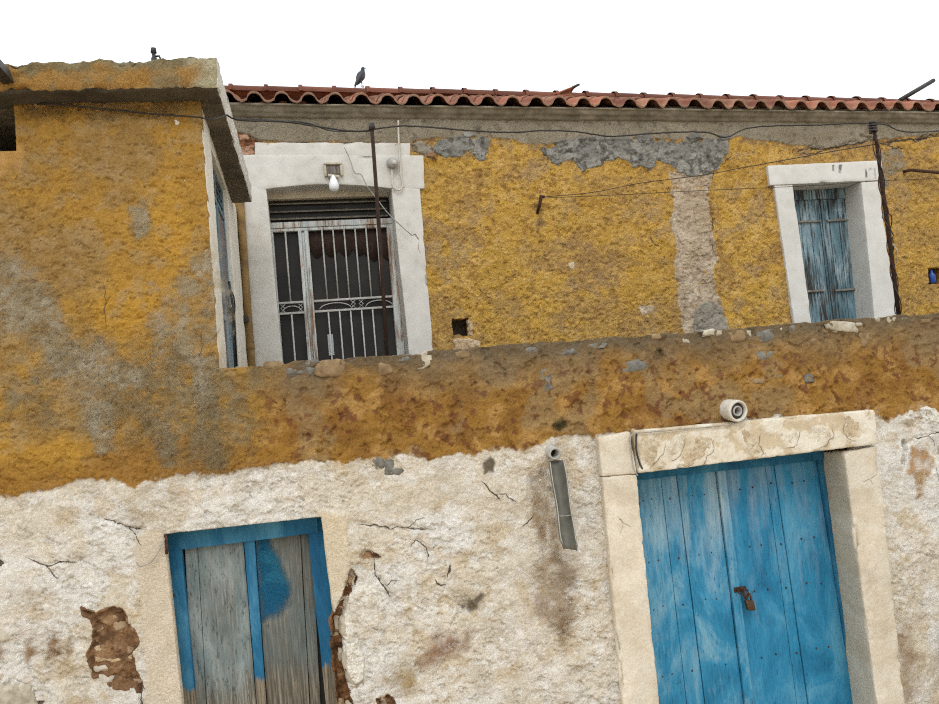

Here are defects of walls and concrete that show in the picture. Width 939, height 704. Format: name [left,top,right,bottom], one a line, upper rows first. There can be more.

spalling [411,141,447,160]
peeling [669,168,730,333]
crack [481,481,534,527]
crack [29,558,74,579]
spalling [361,550,381,564]
crack [360,518,451,586]
spalling [80,605,143,694]
spalling [328,571,357,704]
spalling [376,694,396,704]